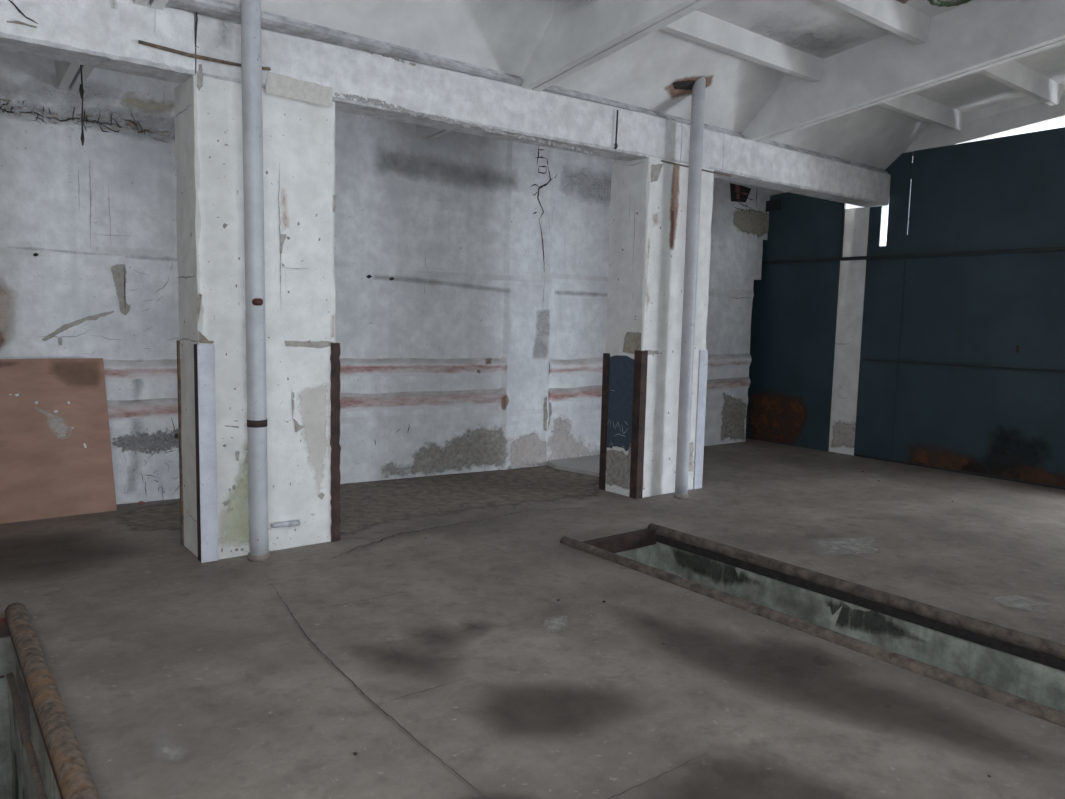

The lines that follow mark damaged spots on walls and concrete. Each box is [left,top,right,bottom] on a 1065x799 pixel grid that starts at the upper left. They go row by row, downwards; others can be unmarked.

spalling [0,99,175,143]
crack [531,146,557,307]
spalling [730,183,769,236]
flaking render [111,264,130,315]
peeling [291,387,327,500]
flaking render [382,397,631,489]
flaking render [832,422,856,447]